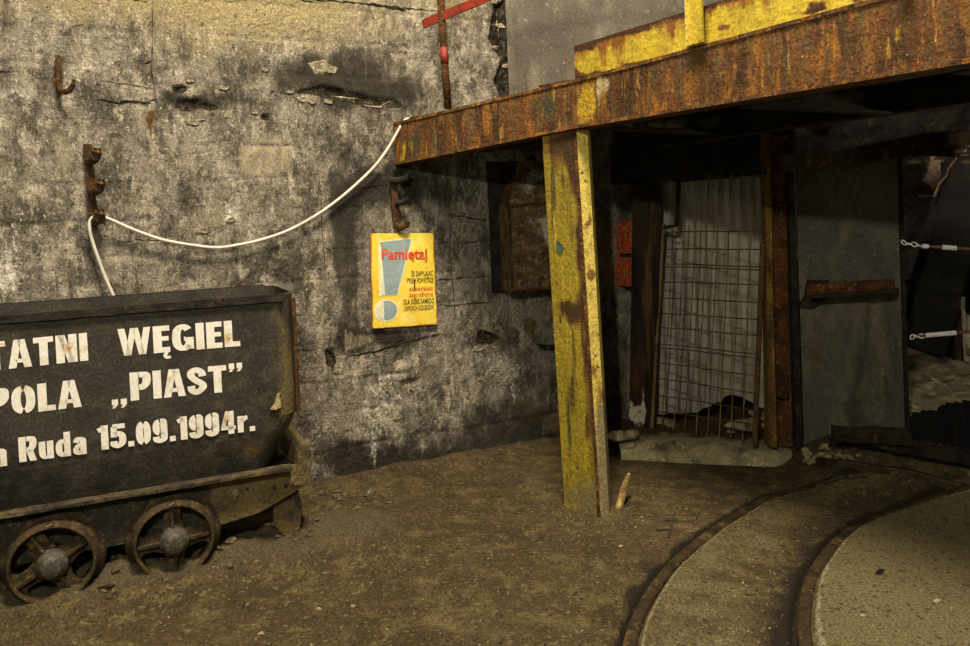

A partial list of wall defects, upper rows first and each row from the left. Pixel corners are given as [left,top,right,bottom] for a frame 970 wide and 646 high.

crack [302,0,436,11]
crack [98,0,158,118]
spalling [271,59,405,108]
leakage [360,370,412,467]